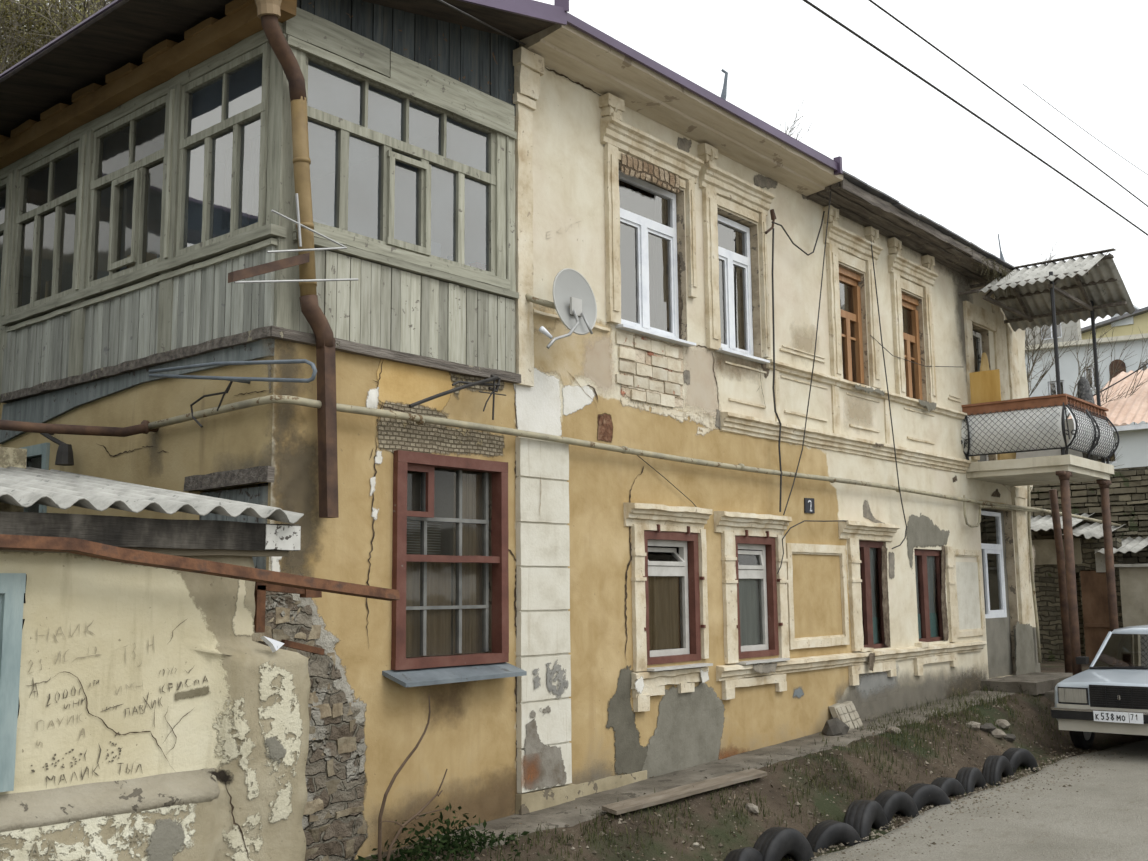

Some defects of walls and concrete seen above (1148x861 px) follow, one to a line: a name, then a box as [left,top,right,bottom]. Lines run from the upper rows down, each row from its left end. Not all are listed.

flaking render [533,254,721,435]
crack [366,362,412,643]
crack [54,671,194,772]
flaking render [212,579,368,861]
peeling [523,660,569,790]
flaking render [635,676,644,694]
peeling [0,803,197,861]